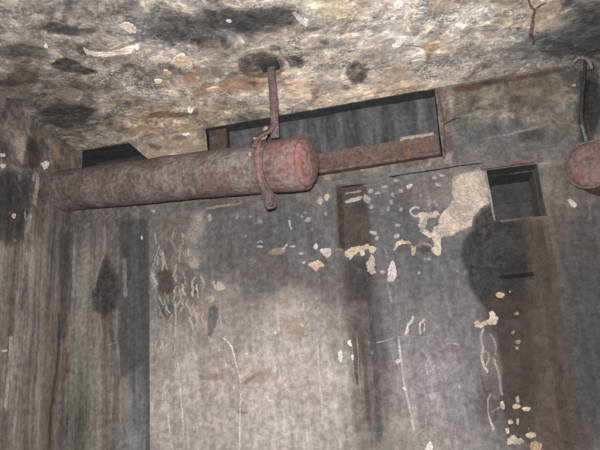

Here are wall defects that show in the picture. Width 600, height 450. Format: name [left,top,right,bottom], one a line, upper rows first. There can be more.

crack [528,0,547,45]
spalling [364,184,413,211]
peeling [385,169,490,260]
peeling [283,243,397,302]
peeling [474,311,498,329]
peeling [500,396,530,411]
peeling [505,418,542,450]